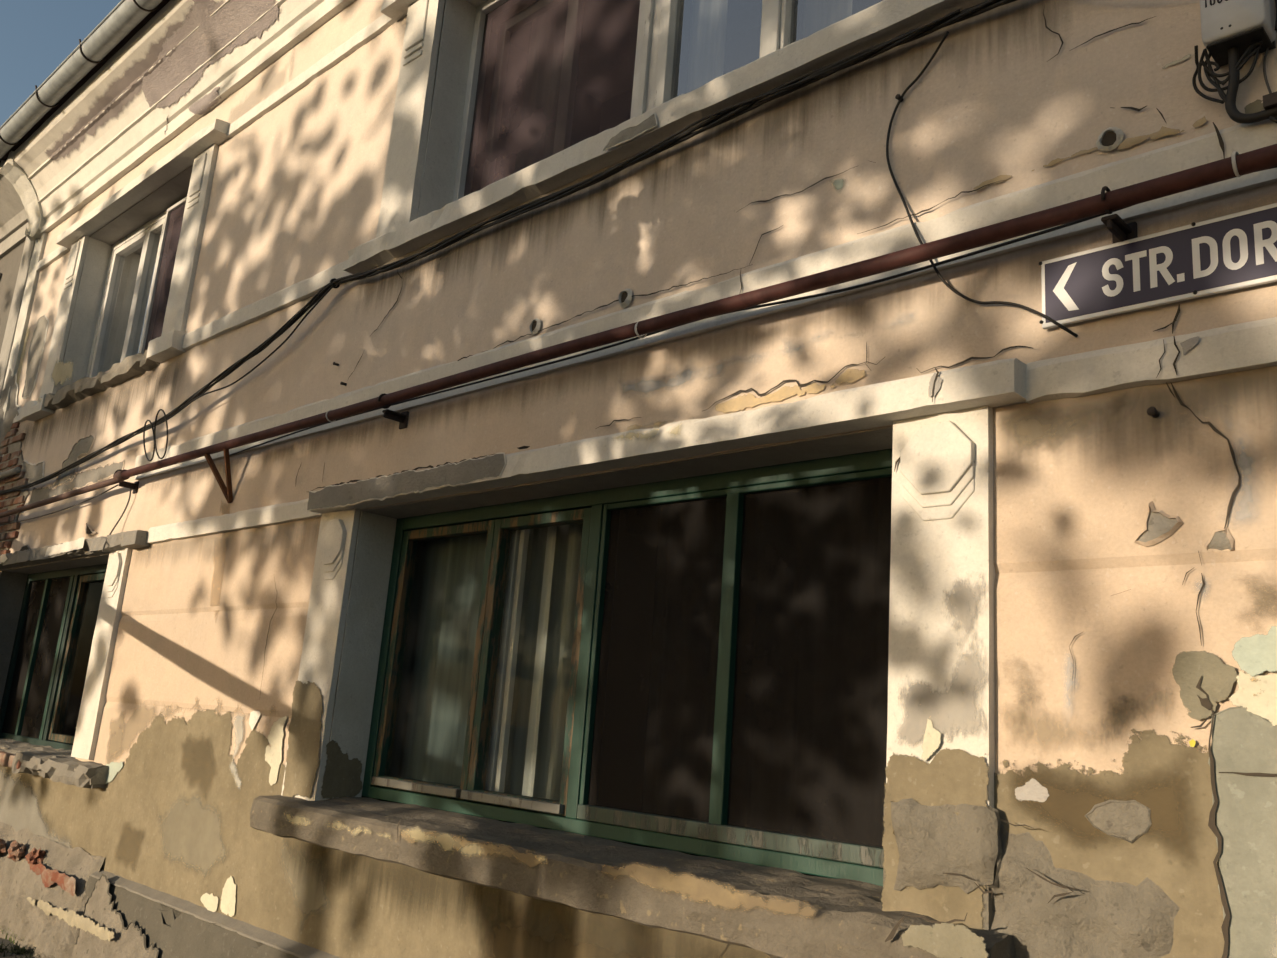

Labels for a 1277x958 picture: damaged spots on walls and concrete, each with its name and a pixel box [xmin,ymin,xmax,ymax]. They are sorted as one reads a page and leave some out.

spalling [142,0,281,115]
water stain [432,197,570,273]
crack [703,342,885,411]
crack [916,346,1032,402]
crack [1154,304,1241,529]
flaking render [0,422,125,564]
water stain [1172,651,1237,720]
peeling [1229,626,1277,726]
peeling [265,716,287,786]
water stain [0,681,772,958]
water stain [881,577,1224,958]
crack [1191,676,1277,958]